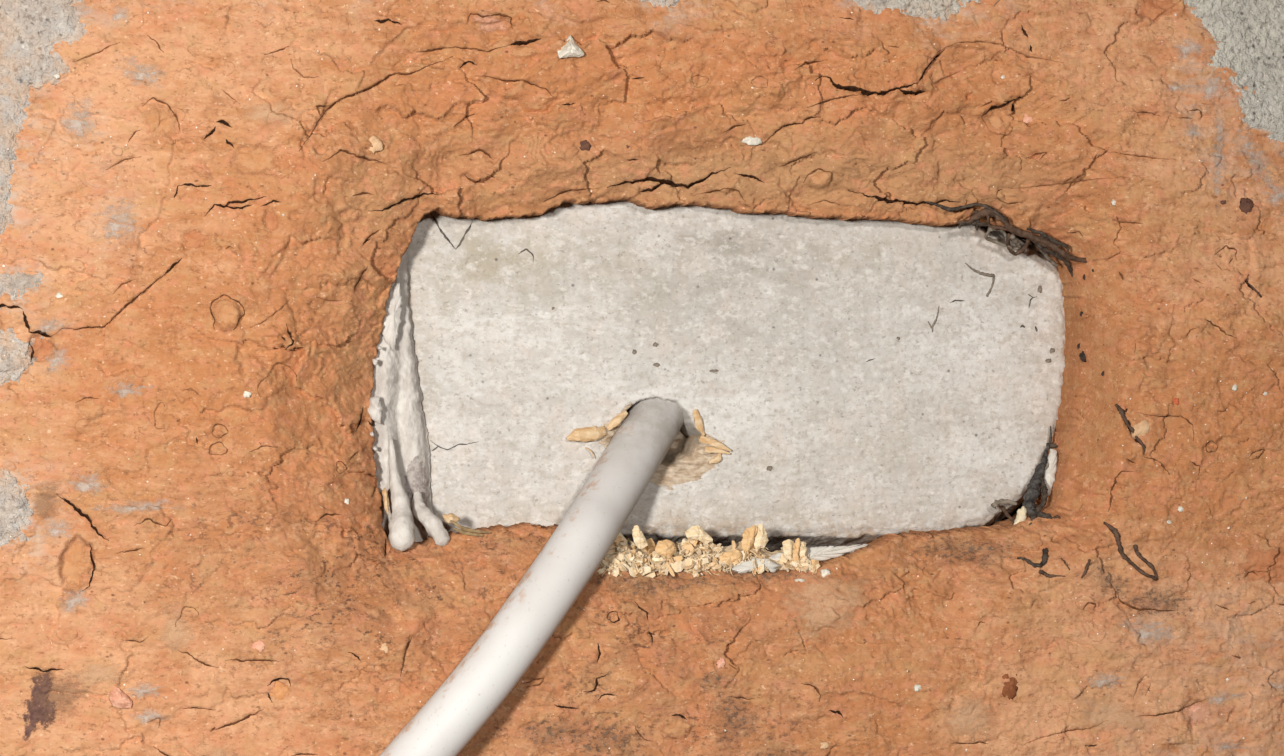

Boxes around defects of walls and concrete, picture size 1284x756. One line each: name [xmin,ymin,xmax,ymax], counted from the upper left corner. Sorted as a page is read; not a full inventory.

crack [264,13,574,164]
crack [543,25,1063,206]
crack [0,258,182,362]
crack [210,114,494,398]
peeling [381,277,402,350]